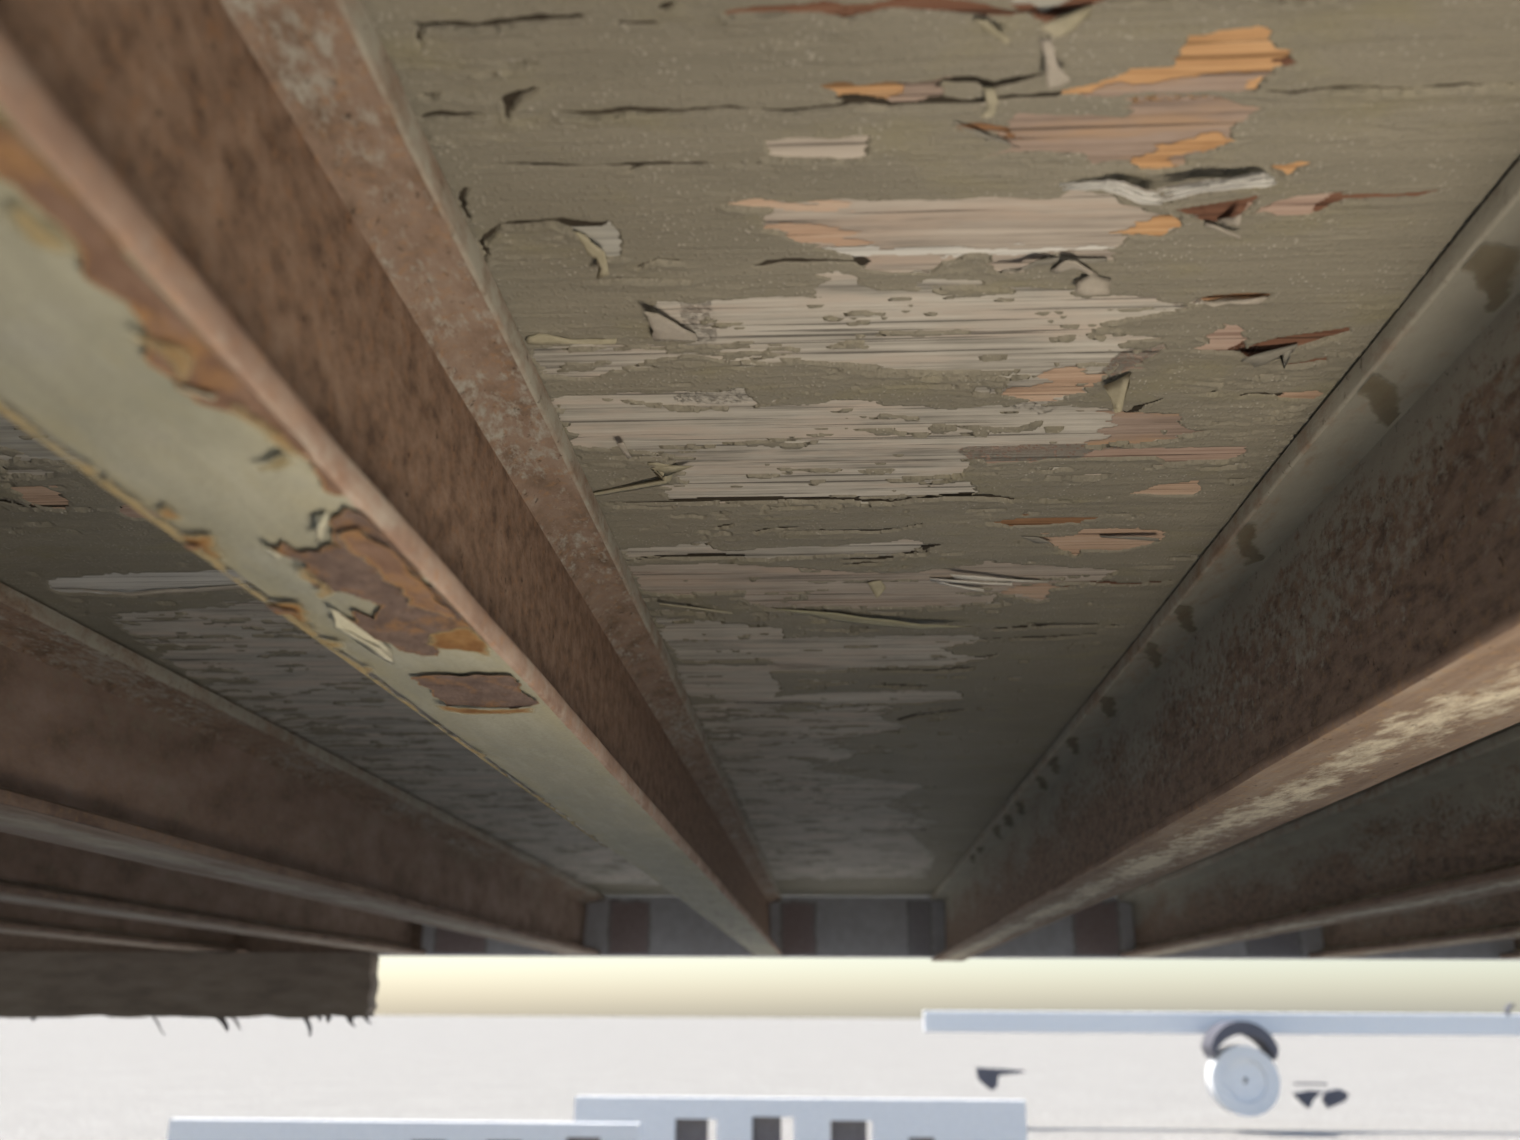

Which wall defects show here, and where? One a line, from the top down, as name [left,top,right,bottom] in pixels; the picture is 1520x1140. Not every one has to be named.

crack [414,1,674,41]
crack [421,74,1062,118]
peeling [821,77,952,102]
peeling [954,0,1295,169]
crack [458,187,609,257]
crack [755,255,871,266]
peeling [526,190,1350,504]
rust [0,116,608,848]
peeling [622,514,1165,705]
rust [410,922,487,953]
rust [608,899,650,954]
rust [1072,899,1121,956]